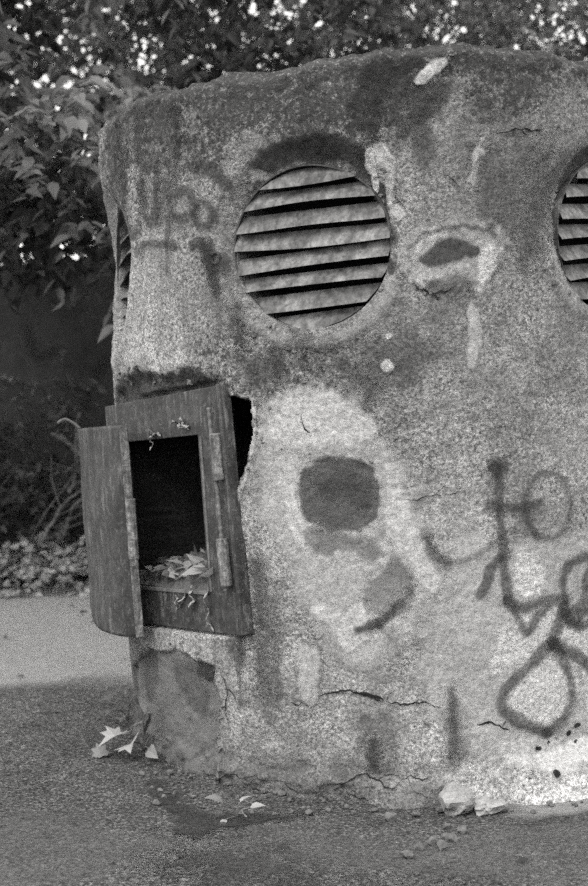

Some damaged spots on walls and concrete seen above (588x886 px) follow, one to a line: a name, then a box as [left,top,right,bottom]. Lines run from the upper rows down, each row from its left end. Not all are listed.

spalling [415,54,454,86]
water stain [299,456,379,532]
crack [220,675,236,727]
crack [291,689,442,708]